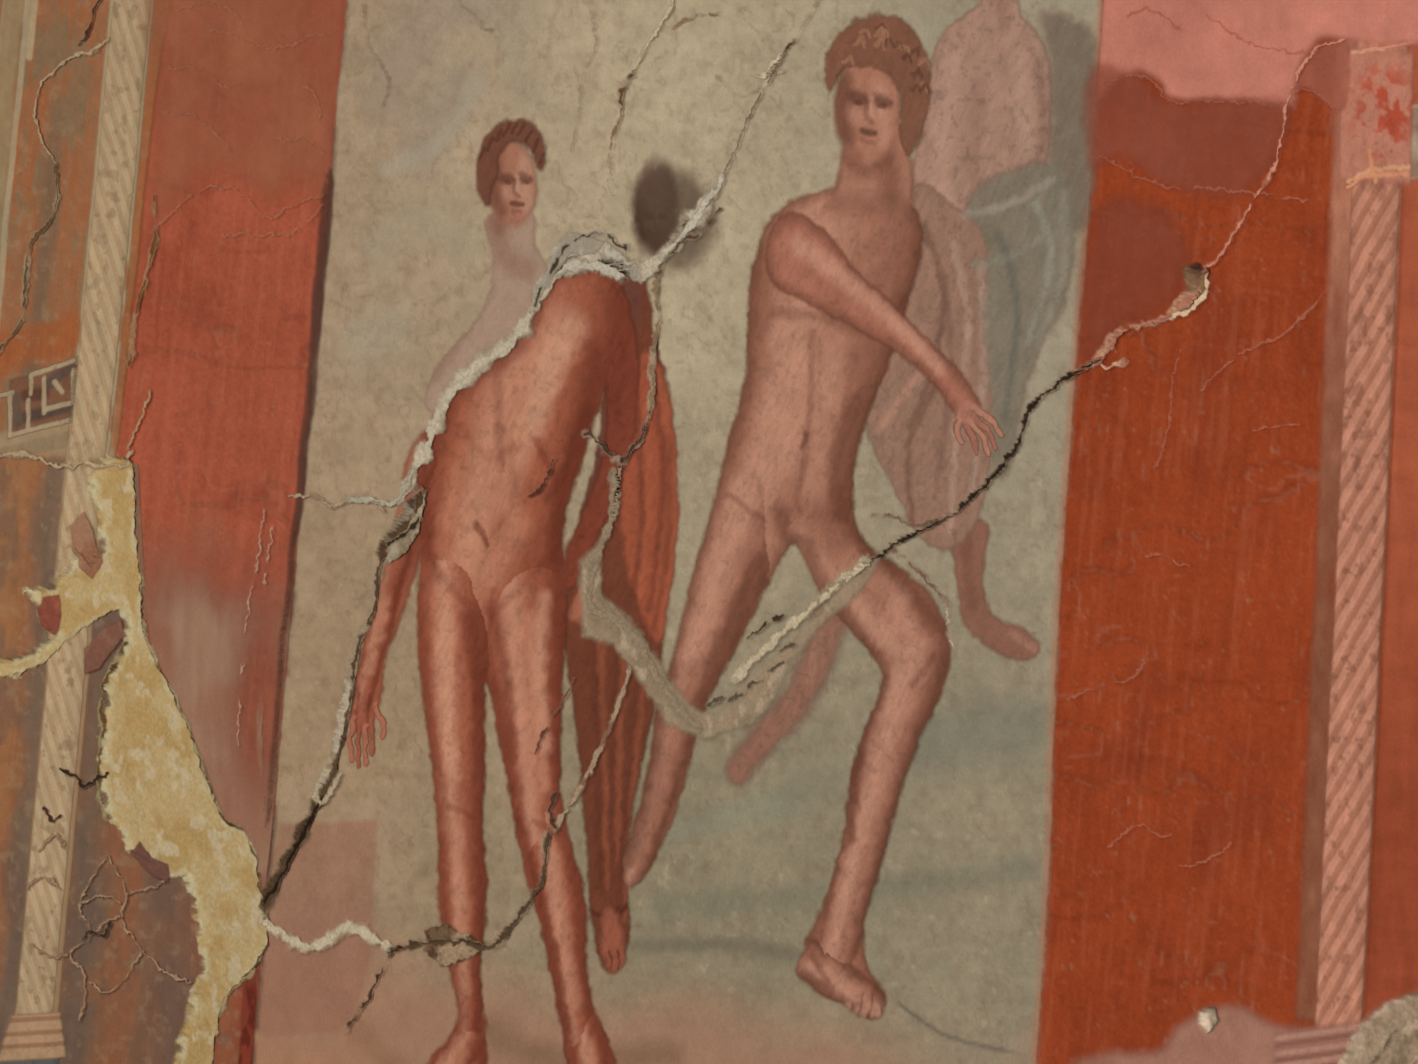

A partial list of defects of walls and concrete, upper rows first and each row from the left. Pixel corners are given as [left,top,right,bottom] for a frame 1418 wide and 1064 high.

spalling [534,232,604,297]
crack [533,230,627,307]
damp [640,180,707,259]
crack [584,39,796,518]
crack [830,38,1346,605]
spalling [1169,273,1209,320]
crack [27,768,191,1021]
flaking render [0,455,269,1064]
crack [259,491,423,913]
crack [346,665,632,1031]
spalling [706,641,796,708]
flaking render [1338,993,1418,1064]